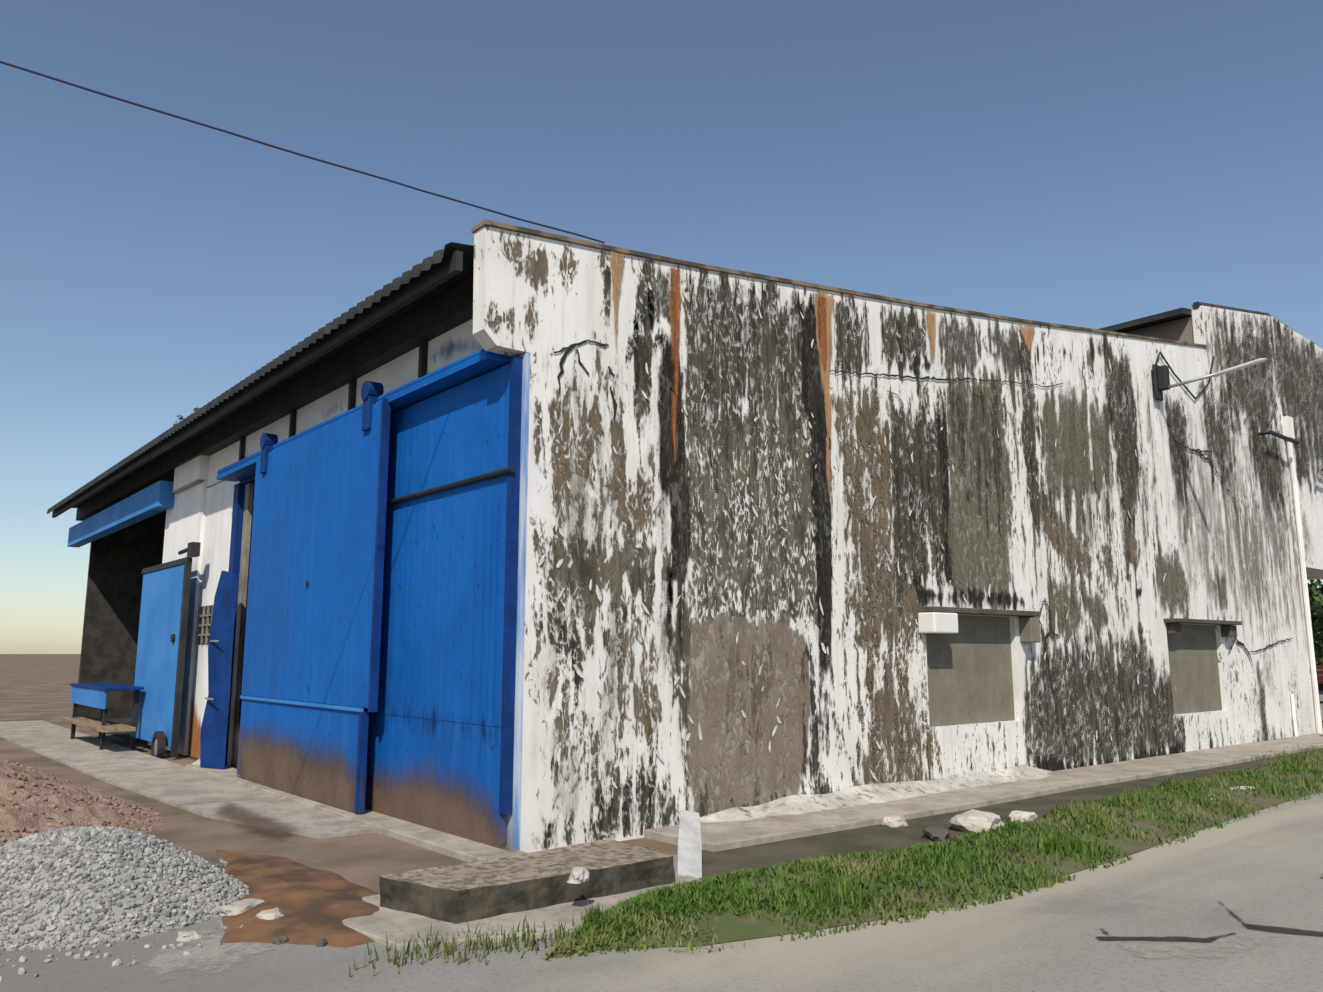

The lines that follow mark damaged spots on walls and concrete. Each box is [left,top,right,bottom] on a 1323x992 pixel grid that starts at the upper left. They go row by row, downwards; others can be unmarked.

peeling [487,231,579,343]
crack [554,340,617,420]
corrosion [610,251,624,348]
corrosion [670,268,681,461]
water stain [632,259,857,817]
peeling [530,318,1037,849]
corrosion [814,291,834,492]
water stain [888,335,1066,624]
peeling [971,331,1194,655]
water stain [1064,308,1323,624]
corrosion [238,735,507,851]
mould [1023,616,1187,771]